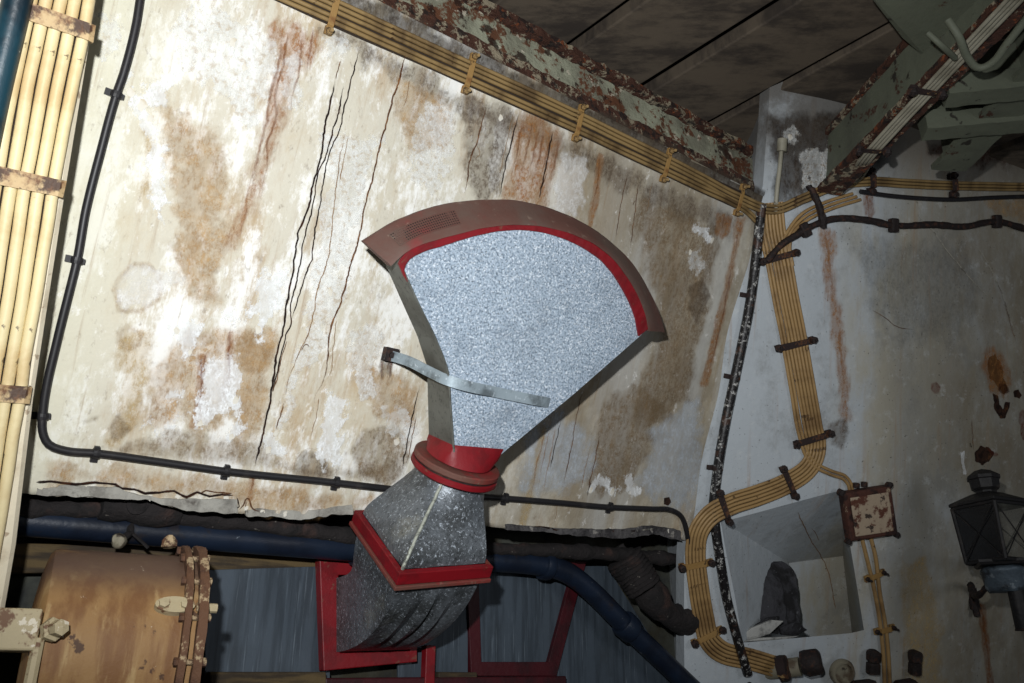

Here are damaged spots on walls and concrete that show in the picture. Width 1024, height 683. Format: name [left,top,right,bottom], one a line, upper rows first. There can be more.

leakage [168,120,231,296]
leakage [150,330,274,431]
rust [233,21,317,233]
crack [256,54,409,459]
crack [466,109,517,188]
rust [504,115,558,202]
crack [539,136,552,197]
leakage [521,186,726,507]
rust [701,214,742,385]
peeling [799,150,827,187]
spalling [988,354,1023,435]
crack [38,480,257,511]